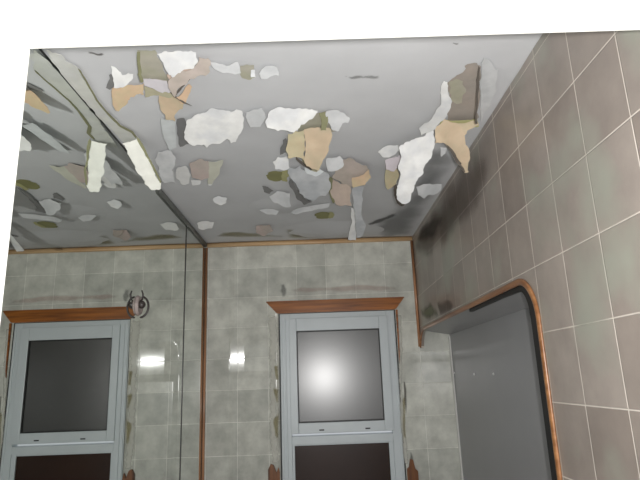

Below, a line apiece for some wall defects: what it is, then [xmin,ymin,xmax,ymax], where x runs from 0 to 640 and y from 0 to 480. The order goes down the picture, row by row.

peeling [46,50,371,240]
peeling [378,58,498,206]